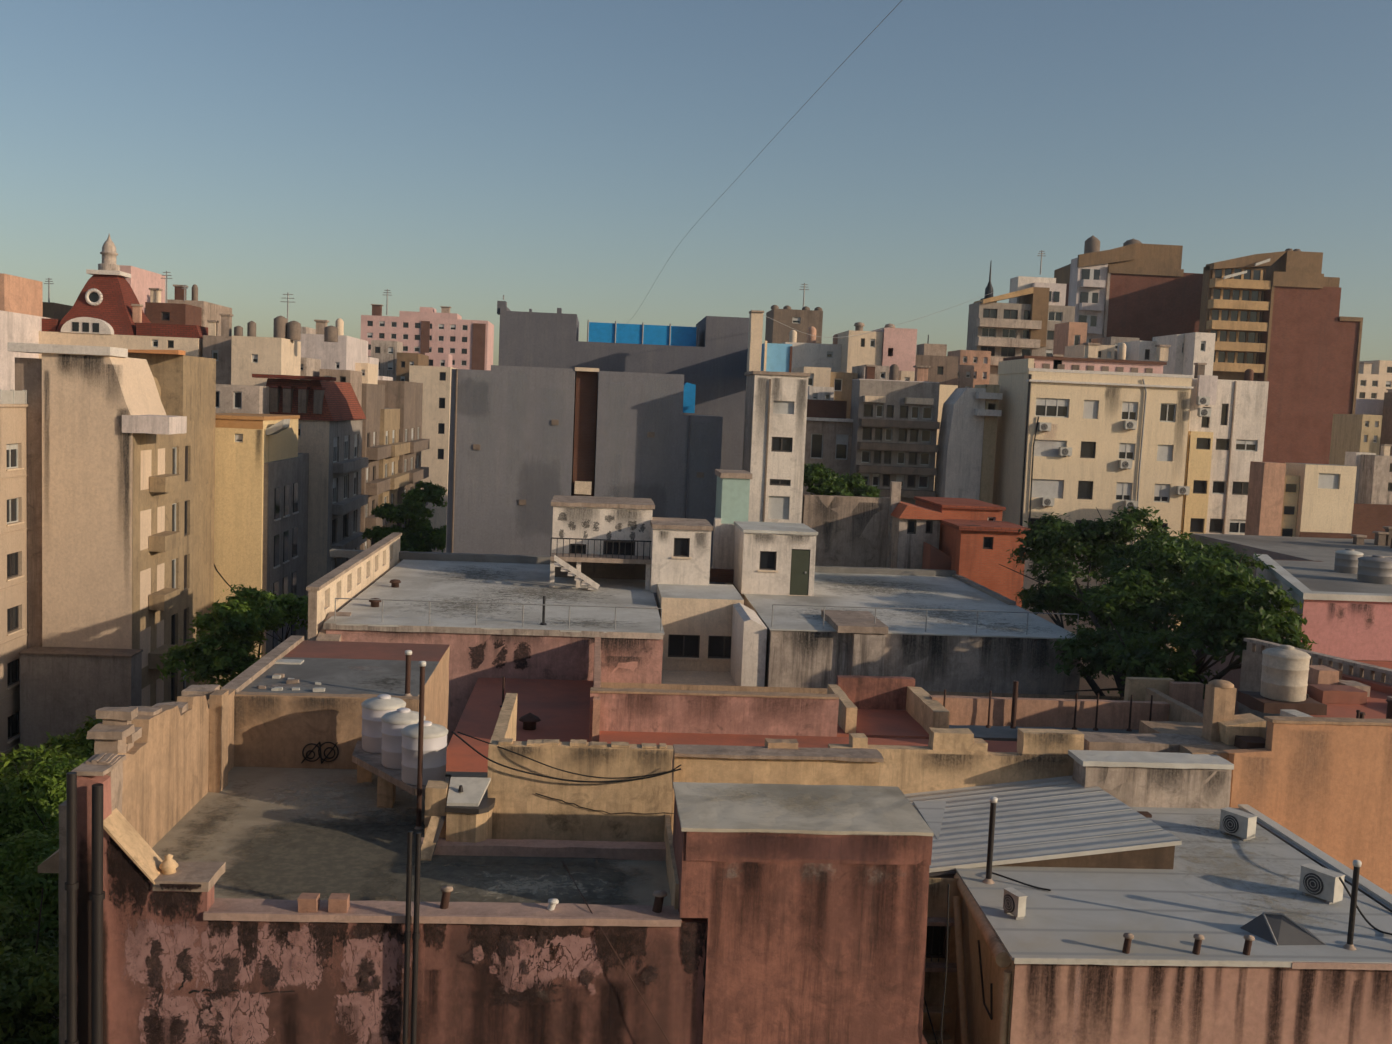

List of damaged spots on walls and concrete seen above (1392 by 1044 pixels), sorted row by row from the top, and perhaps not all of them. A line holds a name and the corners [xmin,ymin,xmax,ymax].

water stain [219,810,640,905]
water stain [77,836,202,1044]
peeling [116,918,413,1044]
water stain [381,923,447,1044]
peeling [460,930,546,992]
water stain [467,924,649,1044]
peeling [580,957,602,995]
water stain [680,922,706,990]
water stain [1030,964,1132,1007]
water stain [1151,966,1203,1020]
water stain [1268,967,1283,1043]
water stain [1299,969,1392,1040]